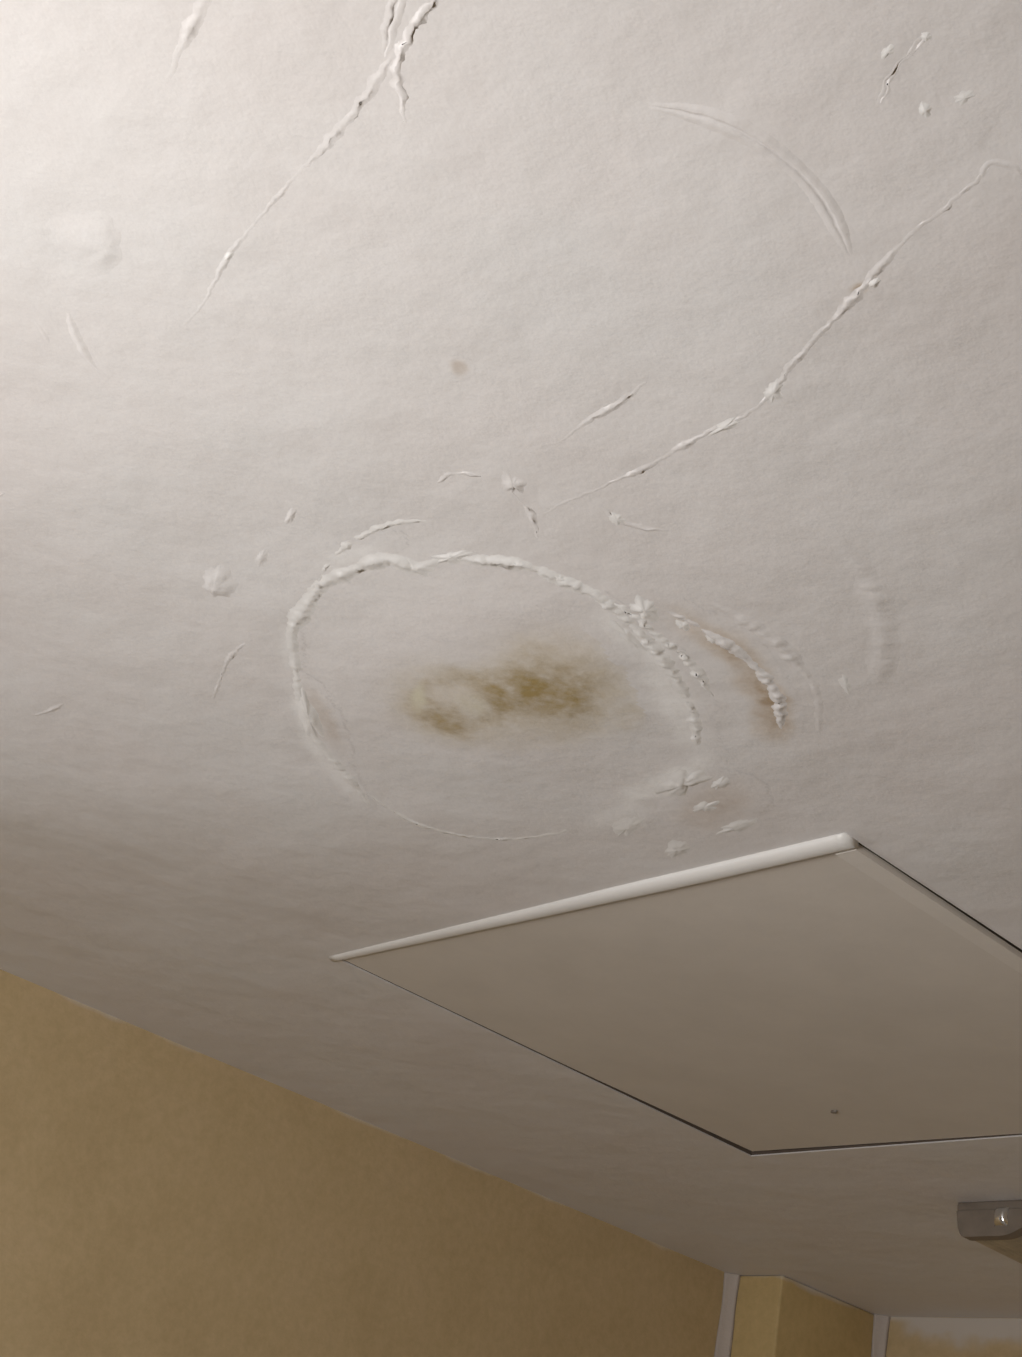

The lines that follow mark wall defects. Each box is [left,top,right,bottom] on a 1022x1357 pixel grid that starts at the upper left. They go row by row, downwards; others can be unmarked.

leakage [357,604,656,764]